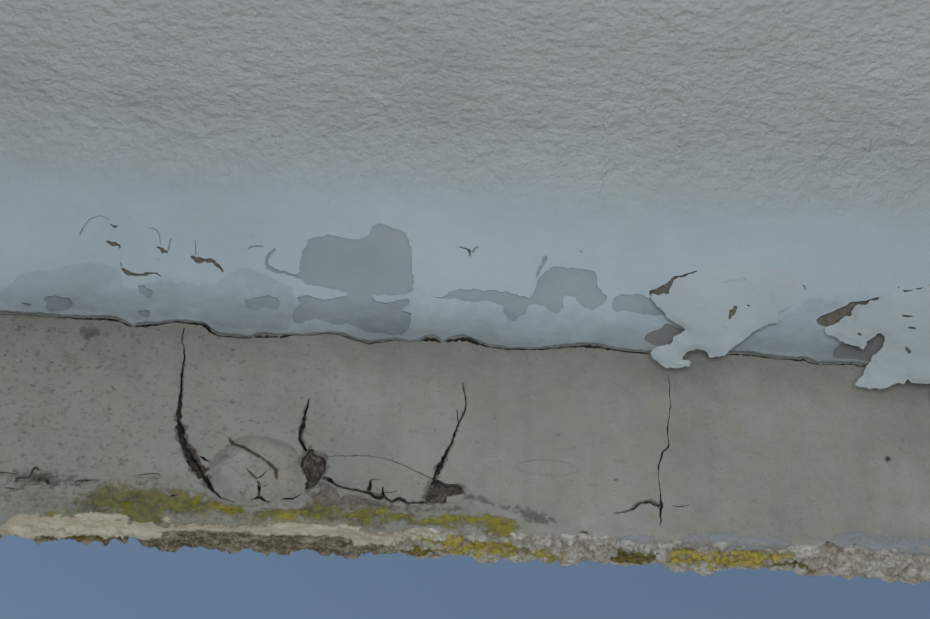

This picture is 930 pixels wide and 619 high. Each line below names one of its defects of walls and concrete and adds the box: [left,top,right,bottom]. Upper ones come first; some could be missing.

peeling [265,224,414,335]
peeling [436,256,805,368]
peeling [816,285,930,389]
crack [176,331,301,502]
crack [298,400,309,452]
crack [322,391,466,504]
crack [629,388,688,525]